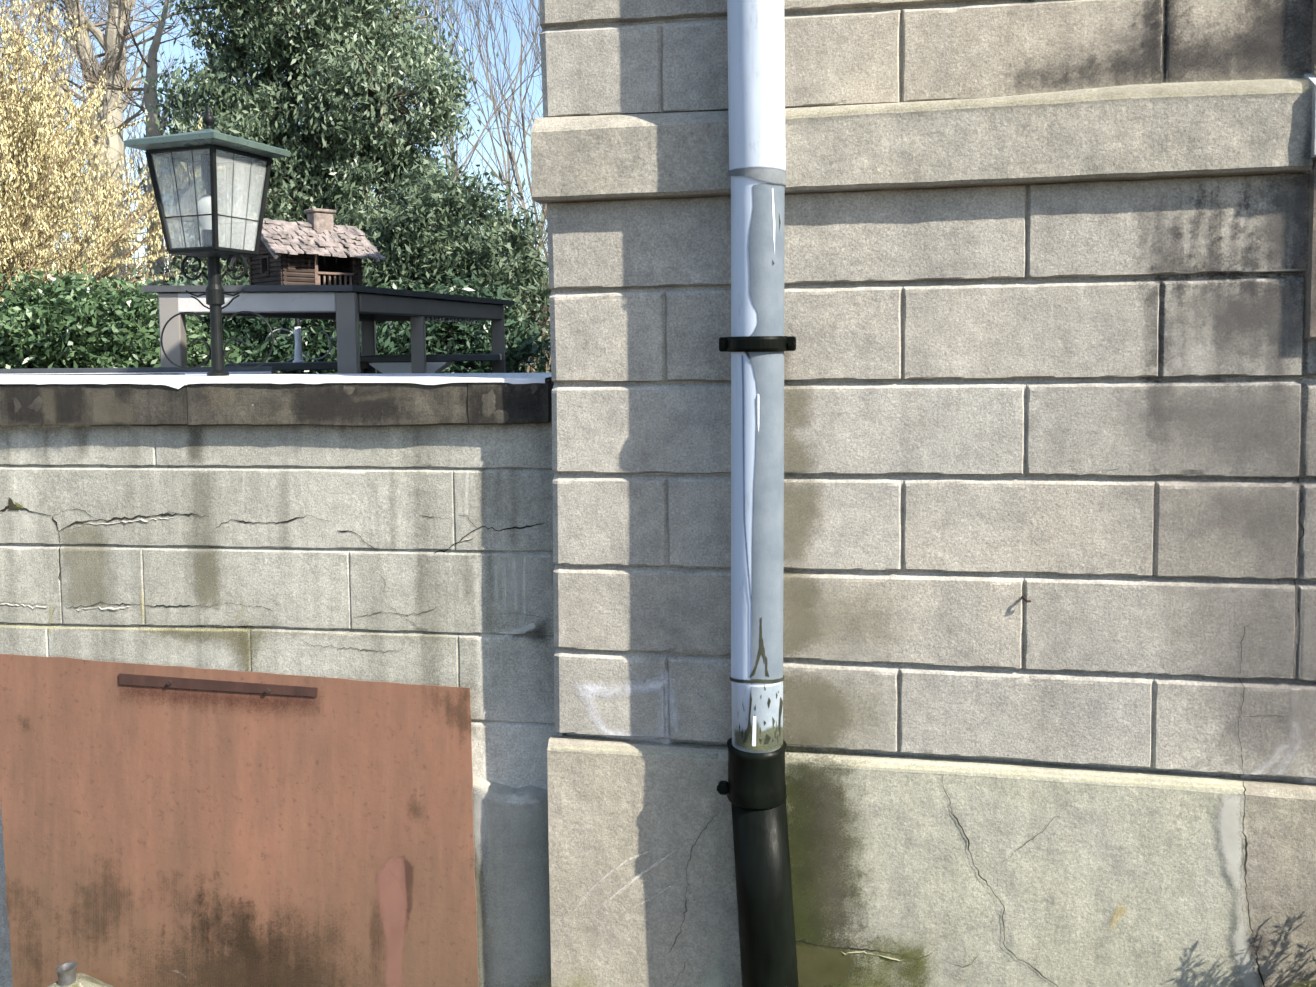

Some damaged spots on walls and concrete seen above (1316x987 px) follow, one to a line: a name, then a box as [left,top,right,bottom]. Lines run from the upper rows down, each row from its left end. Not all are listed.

water stain [1150,0,1177,81]
water stain [1179,171,1310,374]
water stain [0,384,84,428]
water stain [294,383,398,424]
water stain [470,385,542,425]
crack [424,515,543,554]
crack [0,505,436,653]
crack [1238,590,1293,987]
crack [667,812,719,986]
crack [796,773,1067,987]
water stain [796,945,920,987]